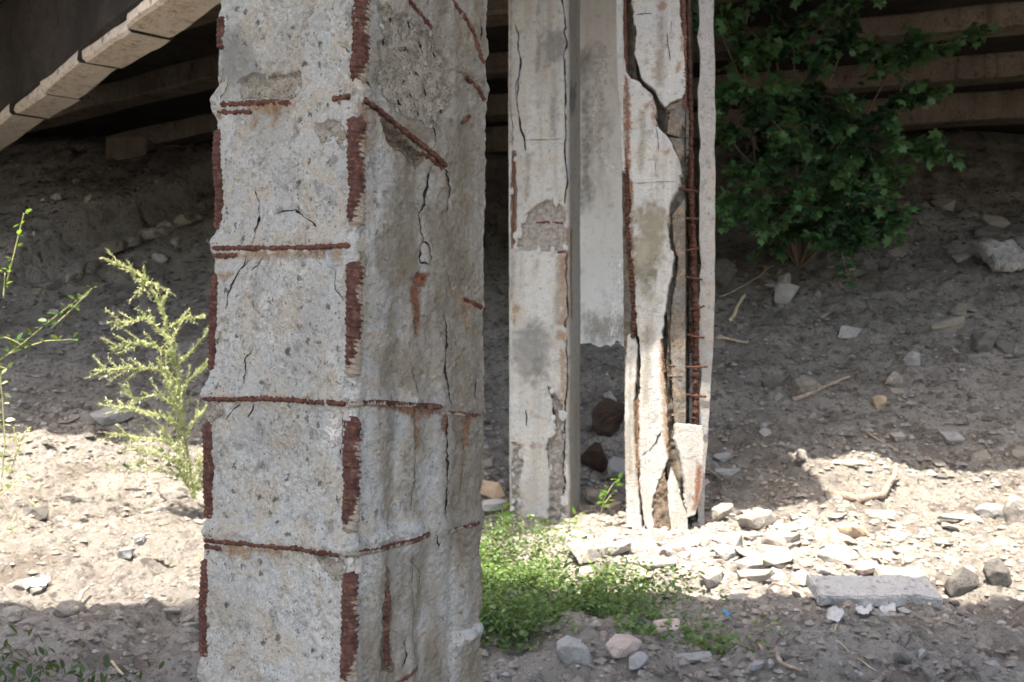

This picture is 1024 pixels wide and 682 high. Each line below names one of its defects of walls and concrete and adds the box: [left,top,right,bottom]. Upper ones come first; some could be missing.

crack [254,191,316,231]
spalling [381,119,424,169]
spalling [373,2,458,129]
spalling [509,150,568,255]
crack [510,0,569,204]
corrosion [623,77,636,281]
crack [227,257,263,303]
corrosion [411,273,428,335]
crack [419,128,478,548]
corrosion [395,407,446,445]
spalling [546,387,568,520]
spalling [653,471,670,530]